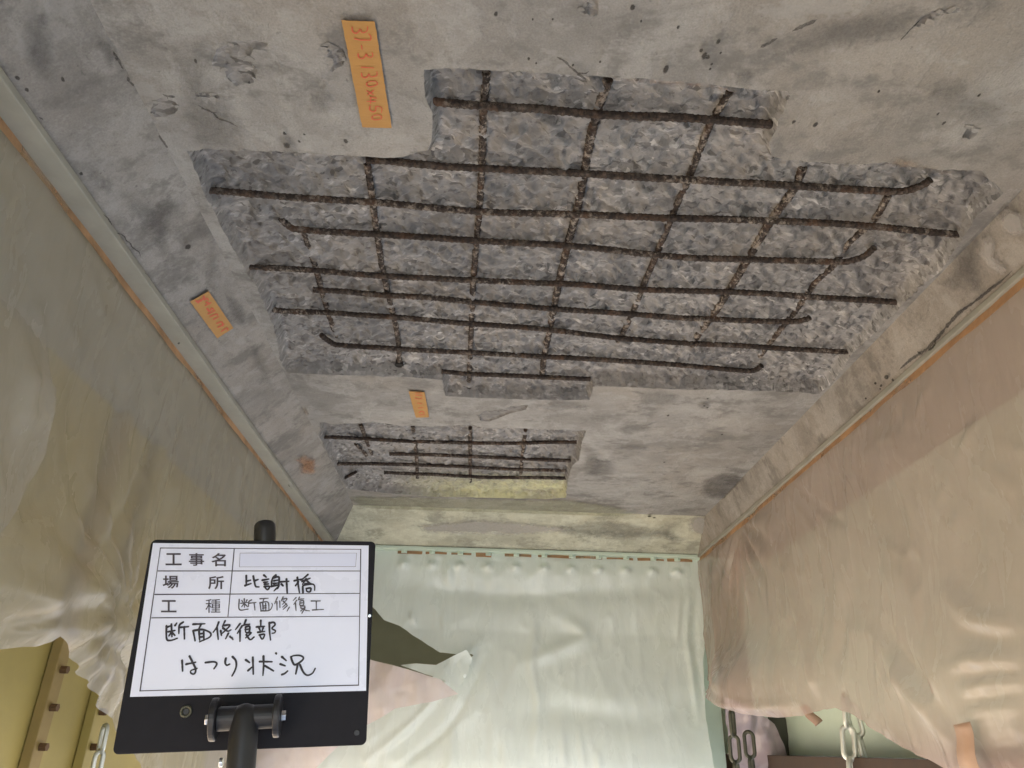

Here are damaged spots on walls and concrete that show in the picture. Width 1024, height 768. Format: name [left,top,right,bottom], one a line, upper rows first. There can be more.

spalling [187,57,1004,499]